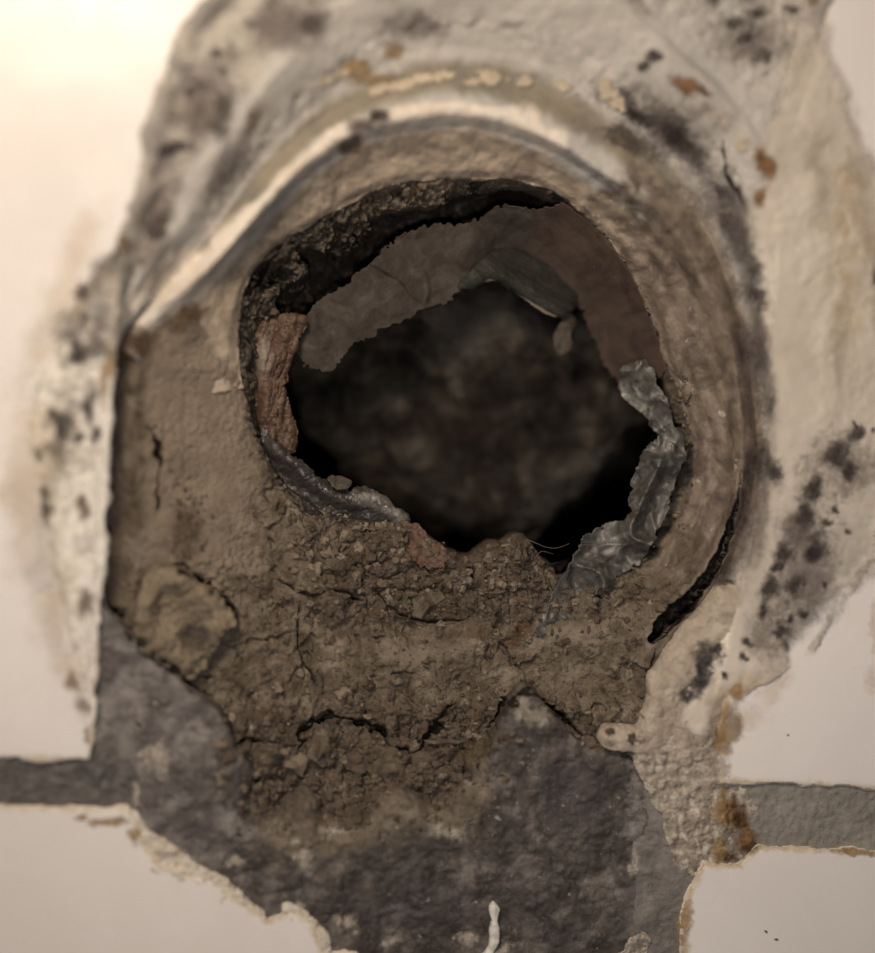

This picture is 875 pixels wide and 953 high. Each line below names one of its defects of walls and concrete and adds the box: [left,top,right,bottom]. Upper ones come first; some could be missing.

leakage [637,50,664,72]
leakage [339,109,389,153]
leakage [30,186,177,725]
leakage [823,421,875,482]
crack [278,580,462,689]
crack [238,737,272,747]
crack [296,703,456,754]
spalling [596,582,758,879]
rust [713,791,757,863]
spalling [131,809,265,920]
spalling [282,901,358,953]
peeling [483,901,500,953]